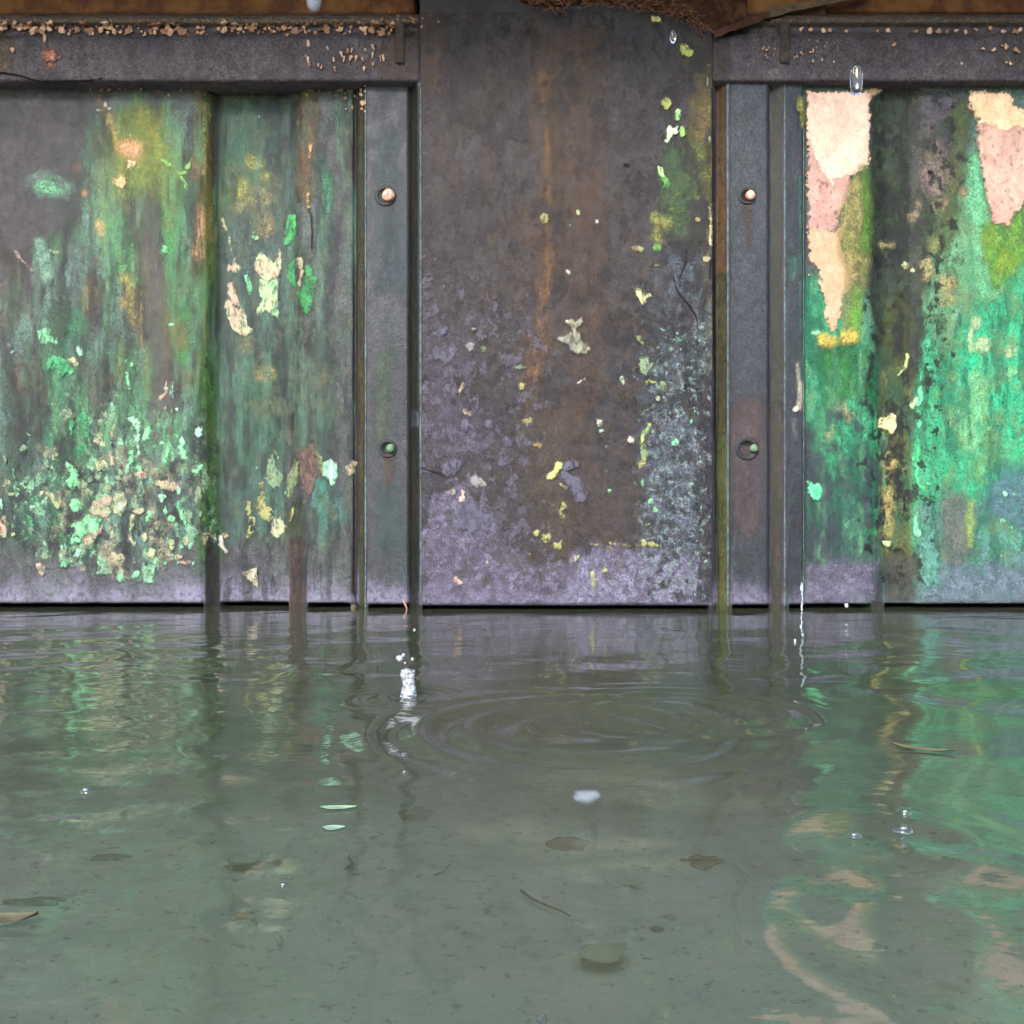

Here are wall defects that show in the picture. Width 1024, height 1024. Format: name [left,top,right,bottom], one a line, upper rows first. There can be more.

leakage [0,90,293,608]
peeling [220,193,318,336]
corrosion [295,249,306,313]
corrosion [298,90,317,201]
leakage [313,93,357,595]
corrosion [410,12,783,609]
crack [673,88,717,533]
peeling [798,88,881,335]
leakage [789,90,1024,637]
peeling [968,90,1024,226]
peeling [0,408,203,568]
corrosion [289,501,306,608]